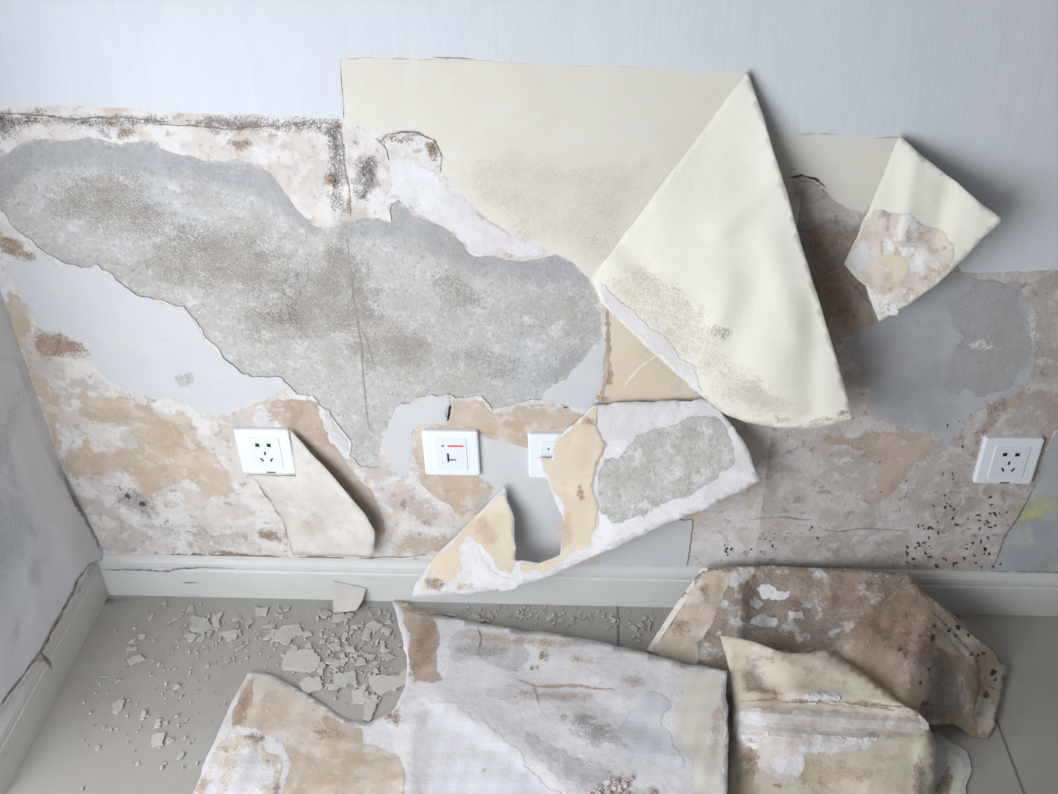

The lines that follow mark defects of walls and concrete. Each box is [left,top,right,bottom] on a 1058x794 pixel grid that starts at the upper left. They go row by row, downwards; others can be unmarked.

spalling [0,136,704,567]
peeling [797,217,1038,502]